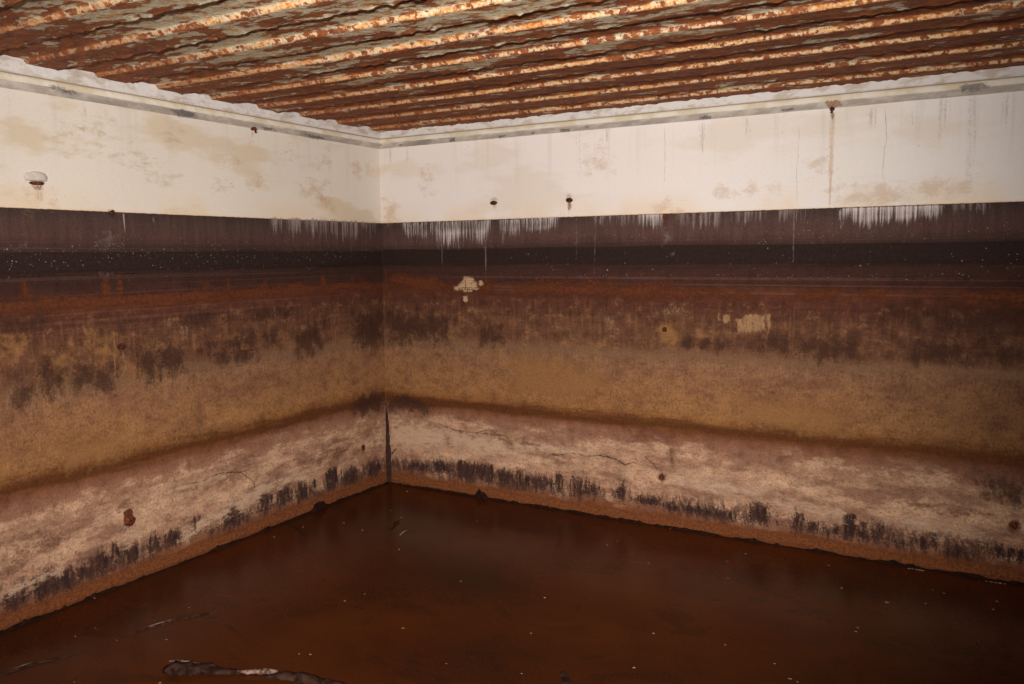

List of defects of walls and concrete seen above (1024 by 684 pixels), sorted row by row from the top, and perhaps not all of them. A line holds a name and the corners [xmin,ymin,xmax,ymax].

water stain [839,205,939,223]
water stain [0,217,1024,277]
peeling [454,276,484,302]
peeling [718,313,771,333]
water stain [0,444,1024,611]
corrosion [0,472,1024,629]